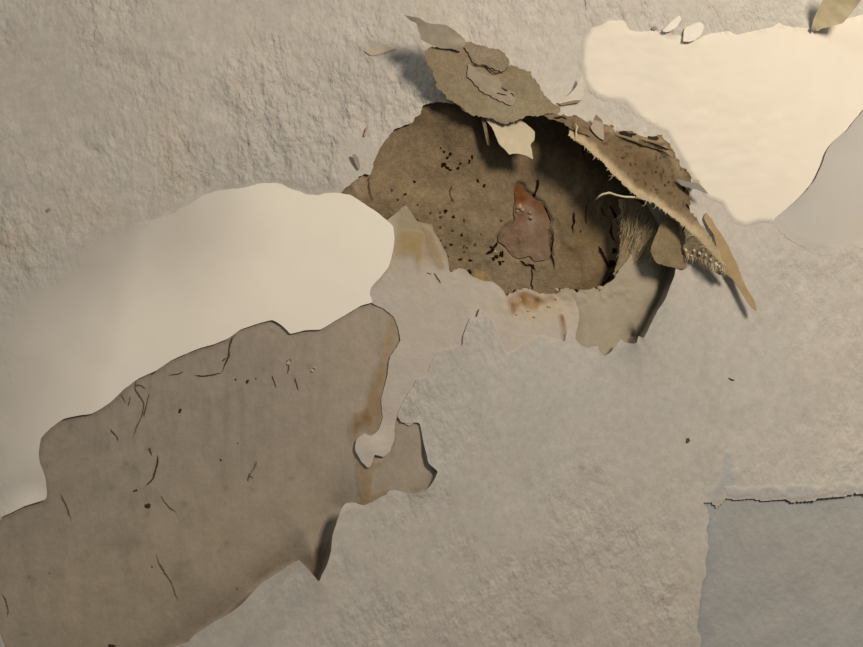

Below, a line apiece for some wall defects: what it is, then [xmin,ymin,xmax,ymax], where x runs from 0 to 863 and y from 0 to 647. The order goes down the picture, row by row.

peeling [464,41,516,105]
spalling [0,102,675,647]